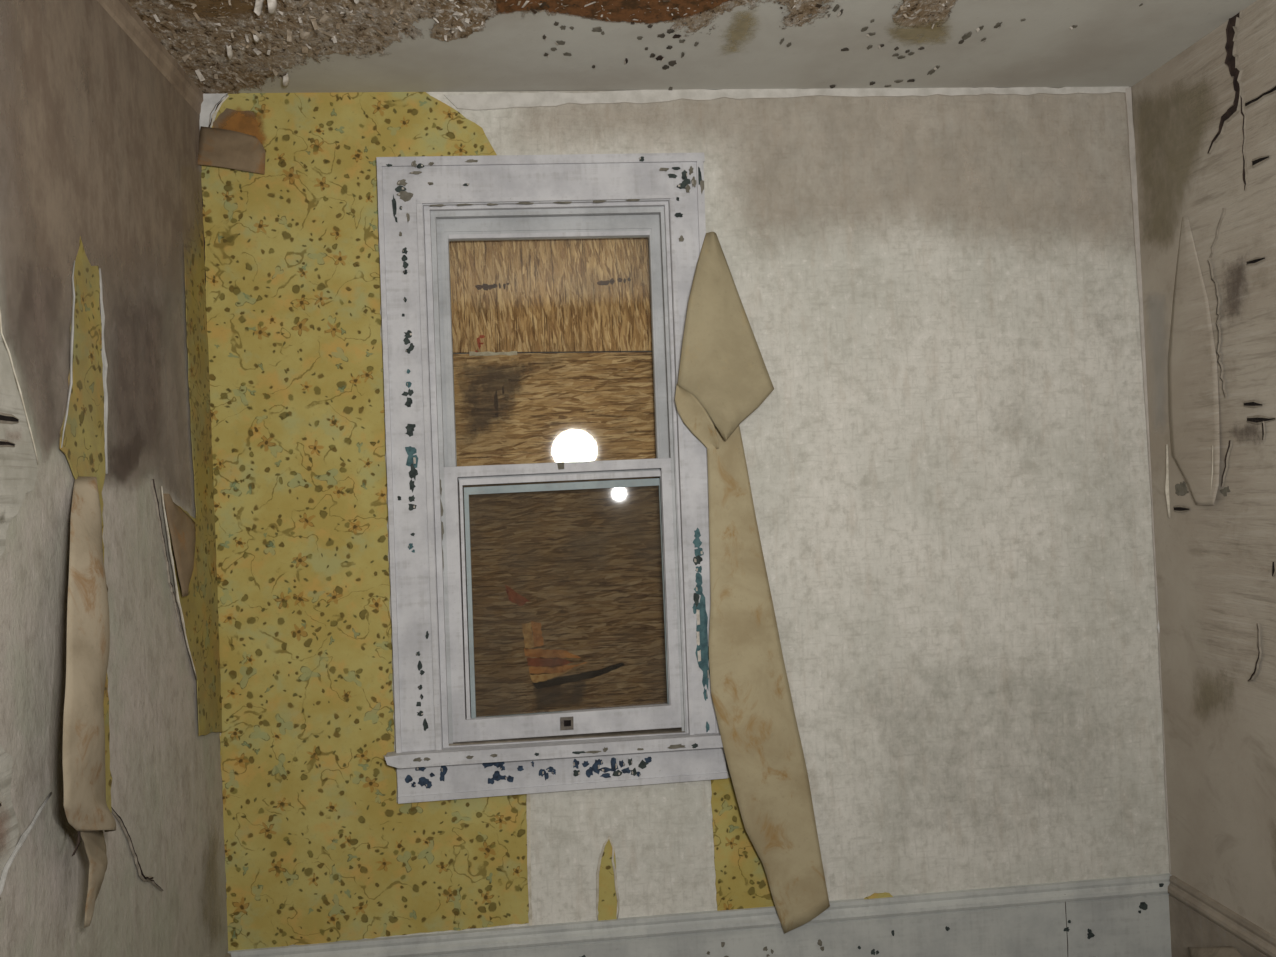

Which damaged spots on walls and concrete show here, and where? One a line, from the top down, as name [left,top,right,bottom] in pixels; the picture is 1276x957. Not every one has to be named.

water stain [172,0,280,18]
peeling [125,0,503,174]
peeling [631,0,843,70]
water stain [0,0,203,500]
peeling [392,160,434,275]
crack [1208,10,1248,398]
peeling [0,310,39,557]
peeling [398,424,418,511]
peeling [444,66,1230,887]
peeling [416,631,429,731]
peeling [405,757,448,788]
crack [111,806,163,891]